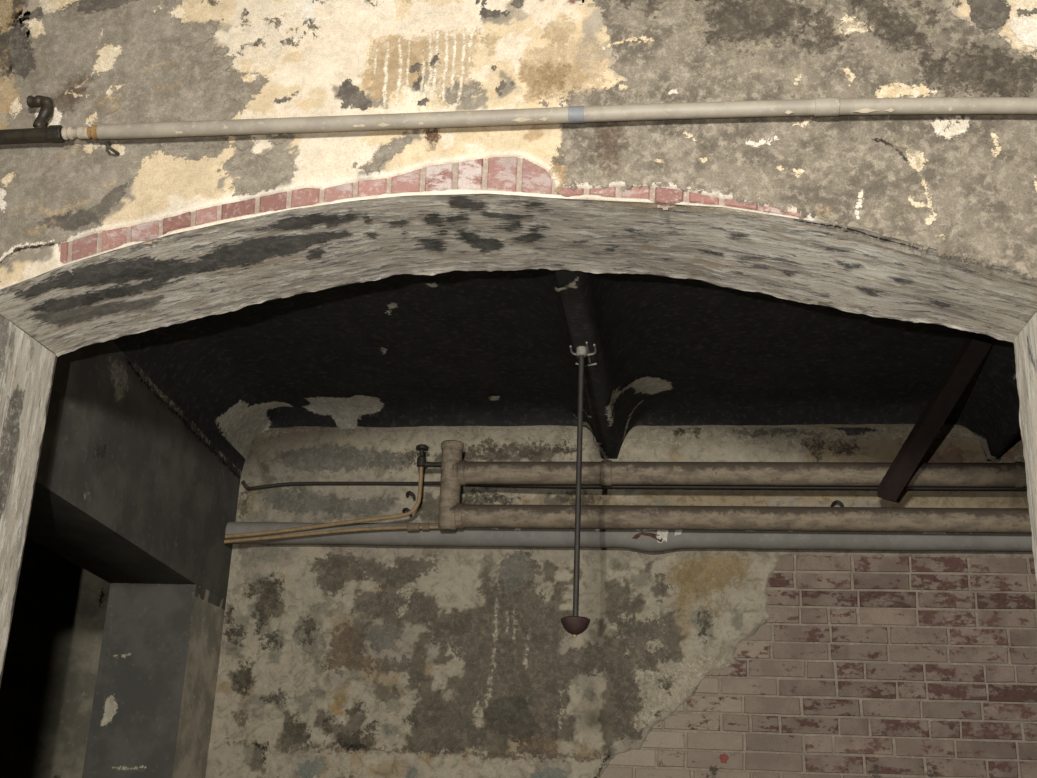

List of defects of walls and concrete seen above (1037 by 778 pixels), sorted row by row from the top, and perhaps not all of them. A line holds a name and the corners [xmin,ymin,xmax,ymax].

damp [0,0,34,128]
damp [238,8,319,56]
damp [365,26,496,110]
damp [519,17,615,100]
damp [620,0,661,19]
damp [908,1,1037,97]
damp [35,107,62,126]
peeling [0,0,1037,328]
peeling [215,376,913,462]
peeling [934,427,1024,463]
flaking render [308,550,1037,778]
damp [232,659,378,778]